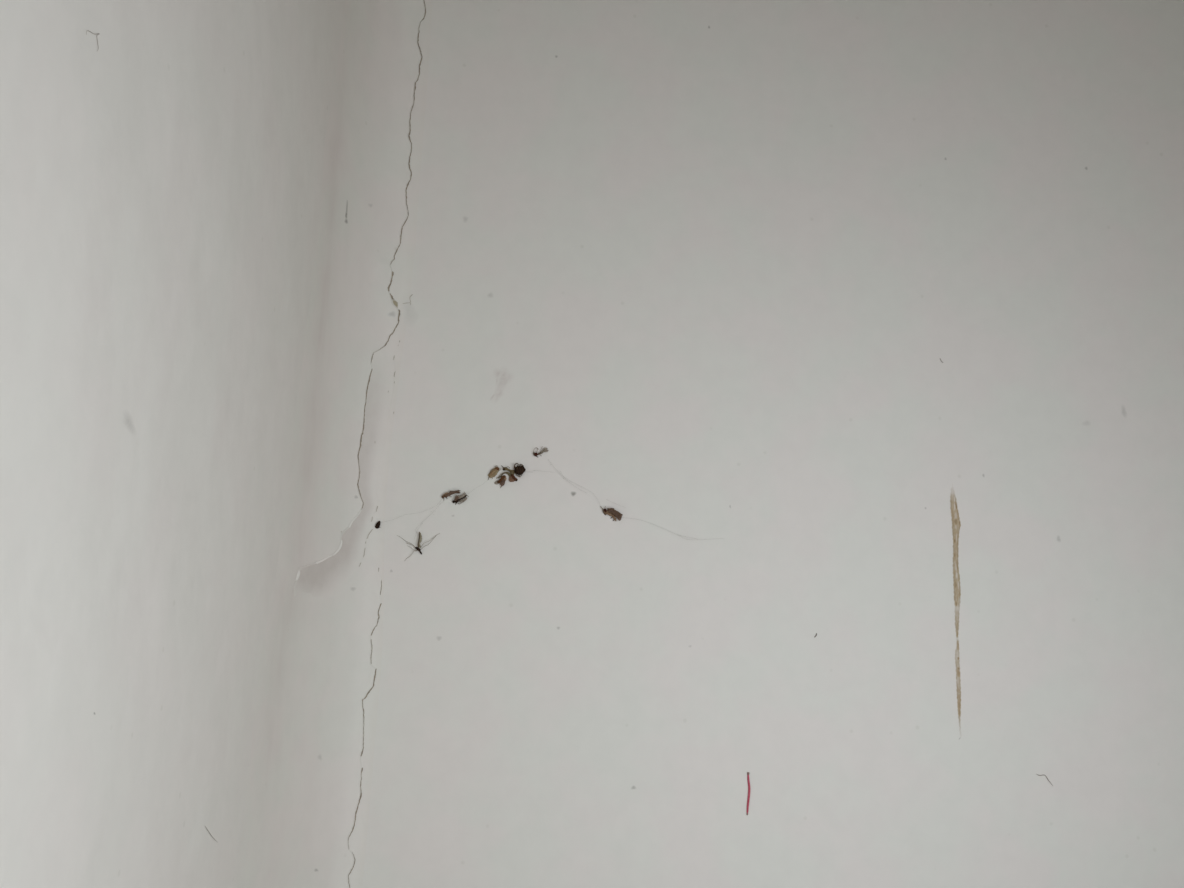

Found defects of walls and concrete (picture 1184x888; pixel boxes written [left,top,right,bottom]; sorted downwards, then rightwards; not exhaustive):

crack [348,1,426,888]